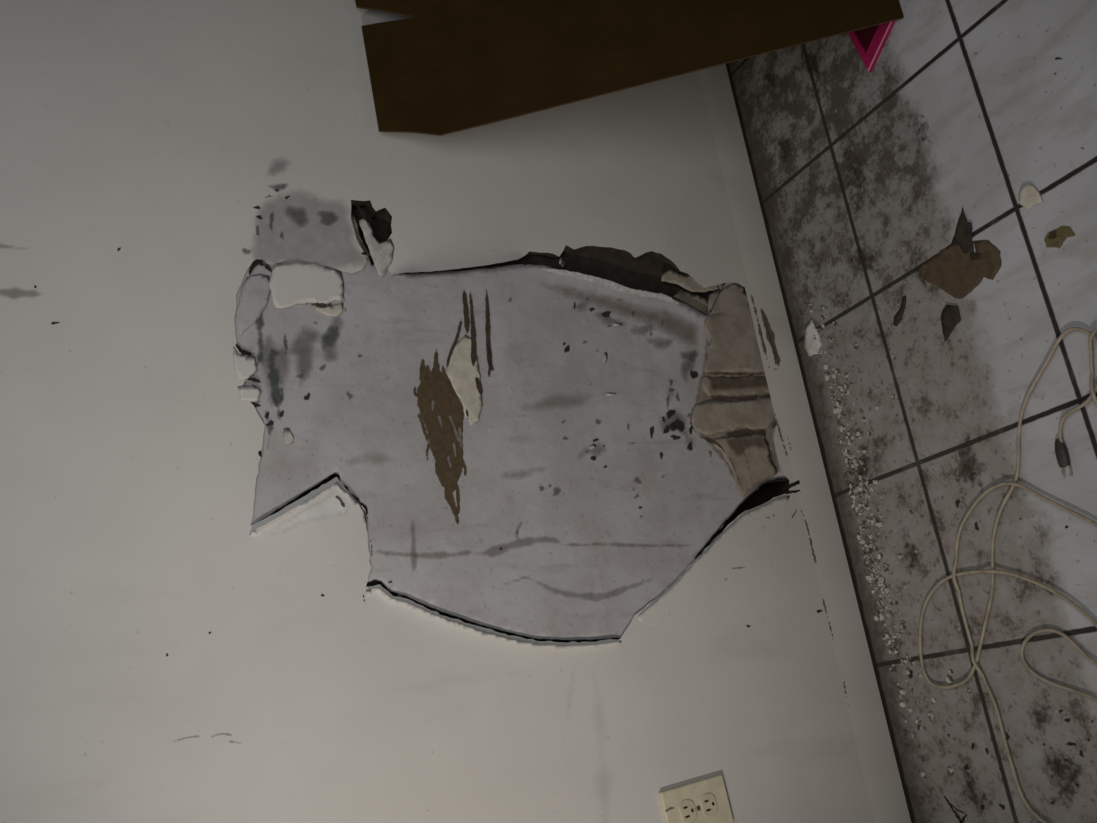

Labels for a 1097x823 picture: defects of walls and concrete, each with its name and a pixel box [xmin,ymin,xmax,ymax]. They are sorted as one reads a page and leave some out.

flaking render [233,196,800,721]
water stain [1044,226,1076,248]